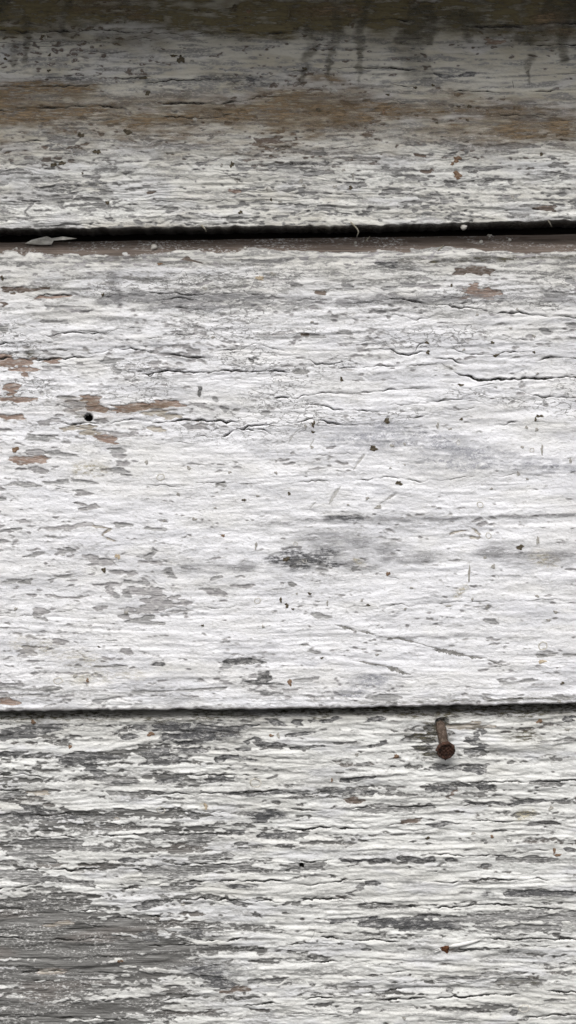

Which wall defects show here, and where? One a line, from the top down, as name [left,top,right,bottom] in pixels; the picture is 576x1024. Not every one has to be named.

water stain [0,61,473,140]
water stain [479,106,576,142]
peeling [429,258,503,304]
peeling [0,354,61,420]
crack [0,272,576,445]
peeling [0,387,240,541]
peeling [59,547,193,625]
peeling [222,657,319,695]
peeling [0,716,574,832]
peeling [0,809,310,917]
peeling [339,855,458,864]
peeling [326,909,576,934]